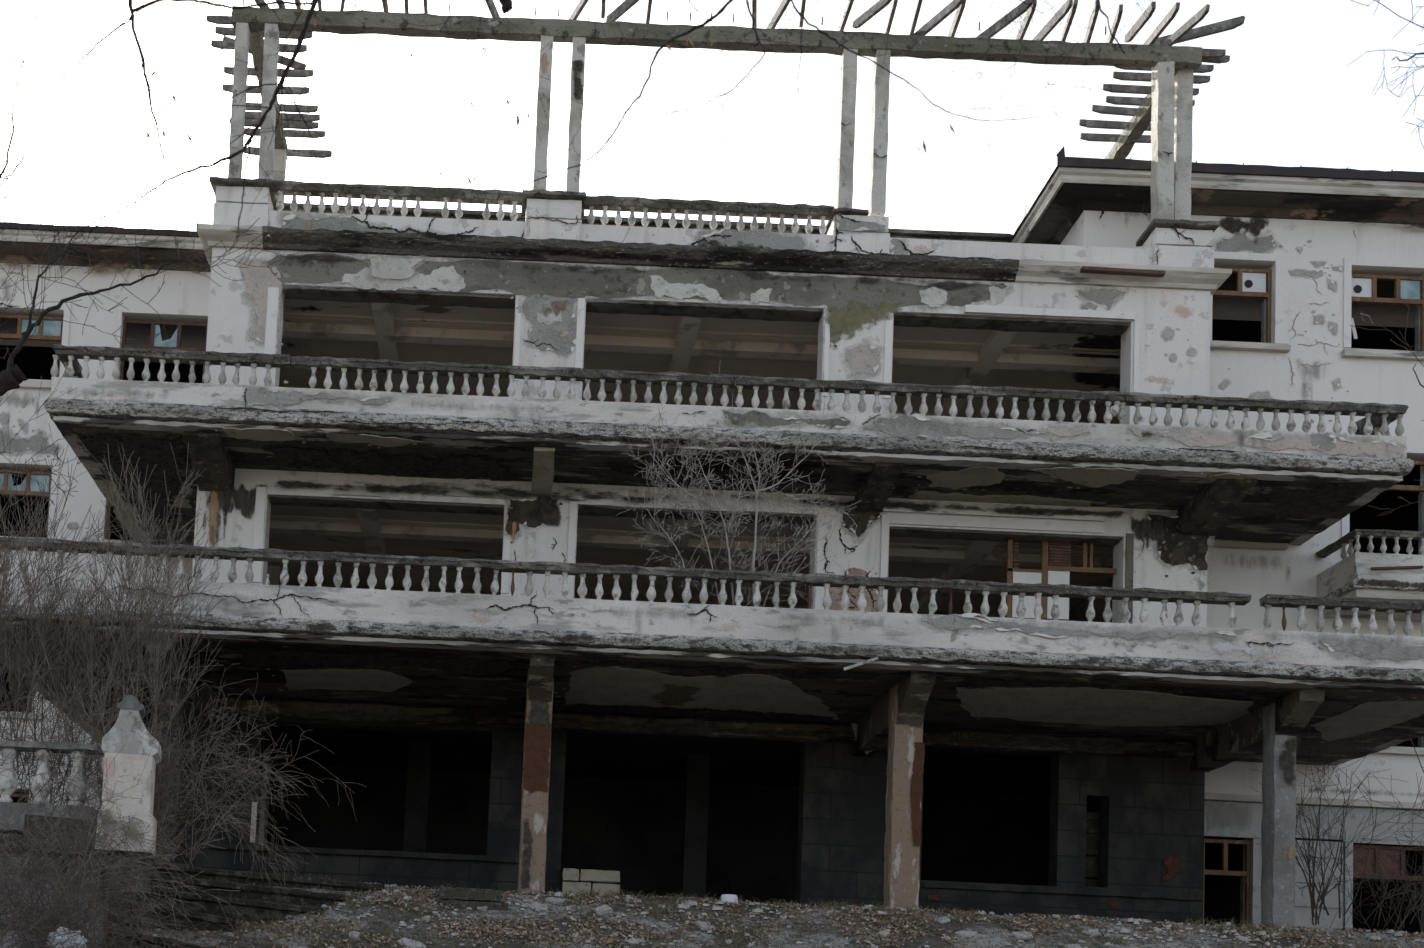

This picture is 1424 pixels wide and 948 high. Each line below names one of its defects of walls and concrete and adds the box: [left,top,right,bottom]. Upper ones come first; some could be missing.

peeling [1216,230,1353,292]
peeling [238,250,1010,379]
peeling [906,466,1147,507]
spalling [1146,512,1212,589]
crack [110,565,337,618]
crack [487,591,620,624]
corrosion [523,723,551,793]
corrosion [910,742,925,847]